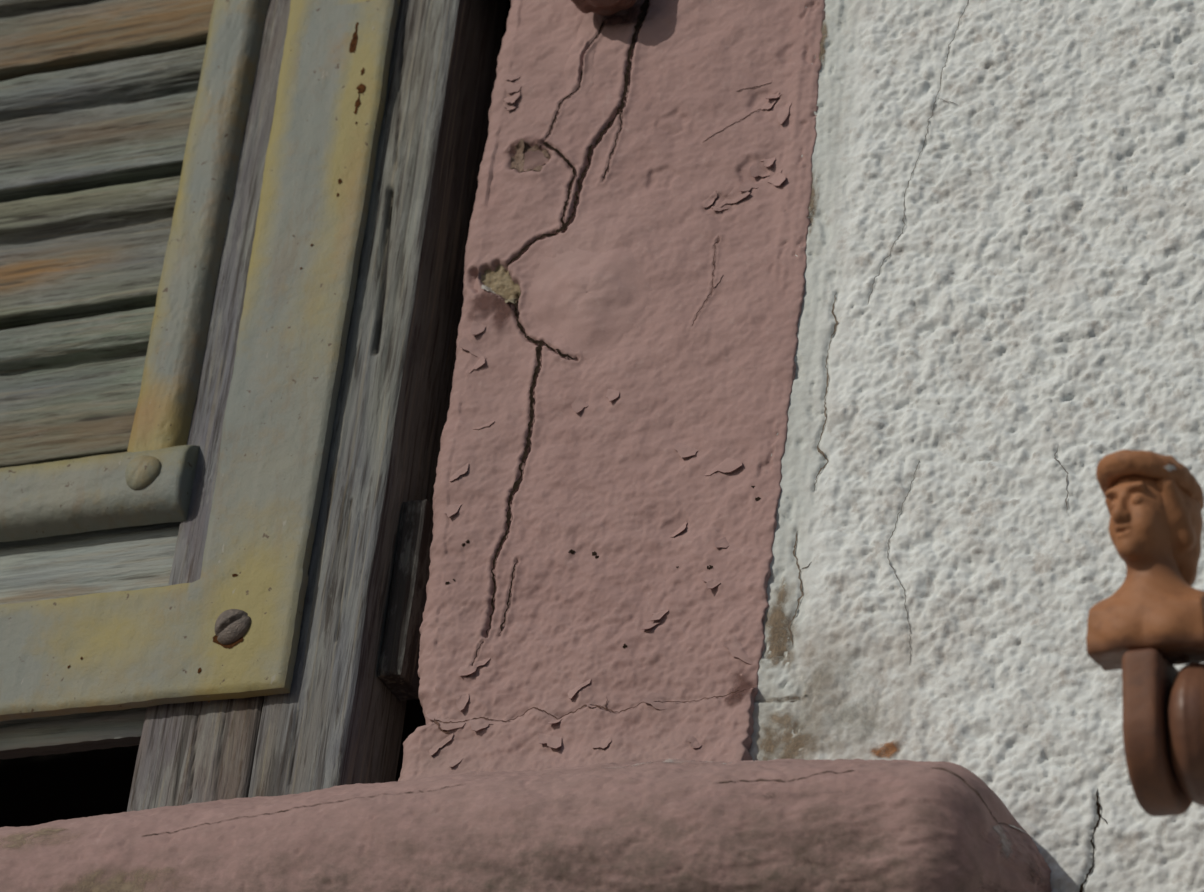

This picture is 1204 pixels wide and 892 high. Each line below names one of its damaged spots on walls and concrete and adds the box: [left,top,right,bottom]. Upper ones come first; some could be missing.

flaking render [509,138,550,172]
crack [507,0,649,267]
flaking render [481,265,521,305]
crack [472,294,577,666]
peeling [704,458,742,476]
peeling [426,694,492,756]
crack [434,689,747,734]
crack [1079,788,1107,892]